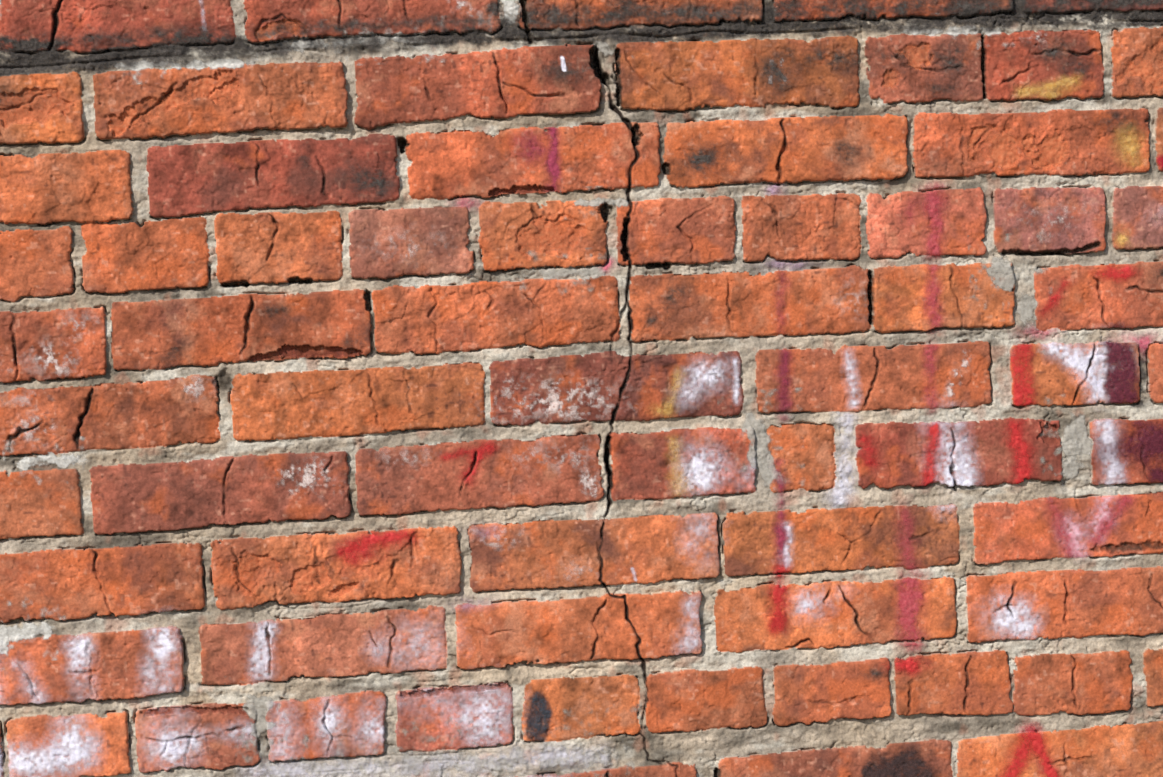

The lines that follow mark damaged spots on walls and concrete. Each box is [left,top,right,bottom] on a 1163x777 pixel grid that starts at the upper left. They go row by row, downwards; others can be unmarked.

crack [9,424,40,451]
crack [74,388,93,446]
crack [593,46,678,767]
crack [826,592,864,633]
water stain [69,638,92,673]
water stain [146,629,175,691]
water stain [55,720,86,764]